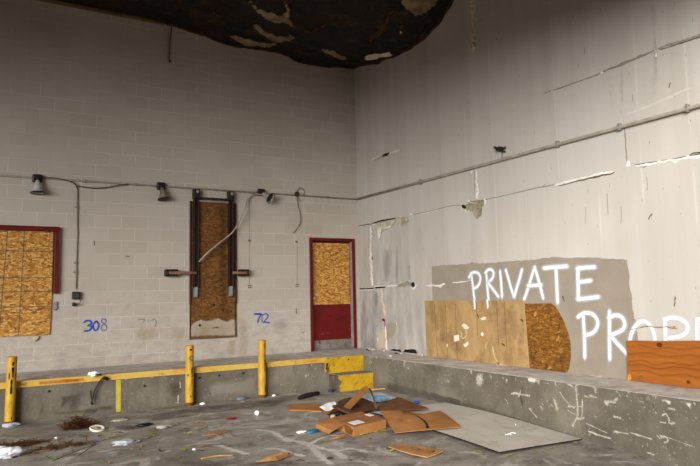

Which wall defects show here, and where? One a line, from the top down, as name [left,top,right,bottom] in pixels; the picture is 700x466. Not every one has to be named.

peeling [401,0,438,16]
peeling [230,1,295,48]
peeling [322,49,392,65]
spalling [461,199,486,219]
spalling [370,216,409,240]